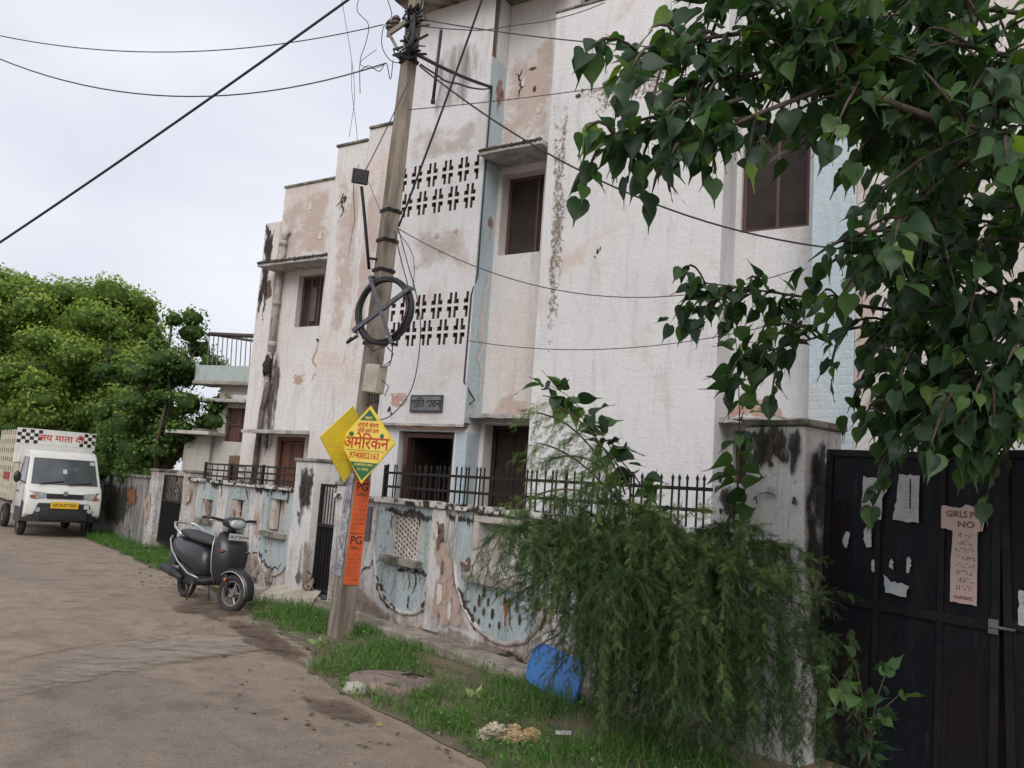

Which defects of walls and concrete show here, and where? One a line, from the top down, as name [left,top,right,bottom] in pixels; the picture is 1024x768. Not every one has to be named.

leakage [257,225,274,320]
leakage [203,467,314,526]
leakage [264,353,280,453]
peeling [293,345,318,385]
mould [750,425,800,476]
peeling [421,521,500,630]